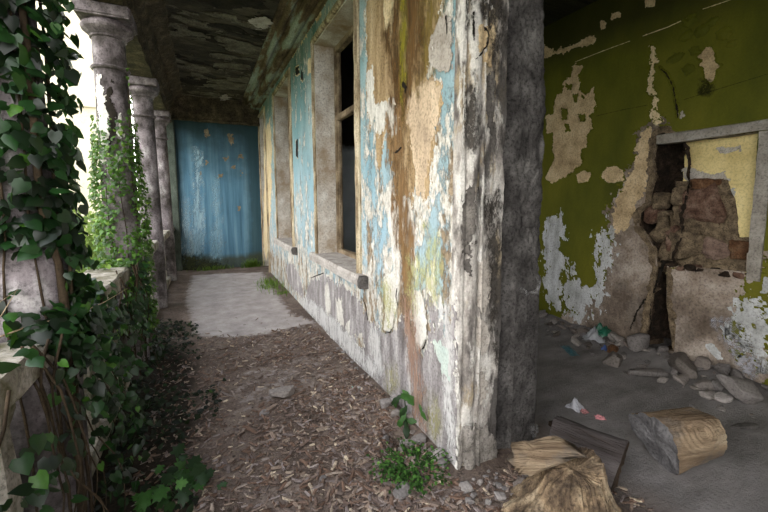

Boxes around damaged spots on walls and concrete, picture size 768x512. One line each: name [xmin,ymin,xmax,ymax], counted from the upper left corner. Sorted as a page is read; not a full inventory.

peeling [96,74,125,170]
damp [463,65,481,152]
damp [465,0,507,73]
peeling [544,36,596,58]
peeling [600,12,621,30]
peeling [696,45,723,85]
peeling [303,0,498,470]
damp [483,185,503,366]
crack [630,260,666,331]
peeling [540,63,768,384]
damp [299,295,397,394]
damp [427,296,456,462]